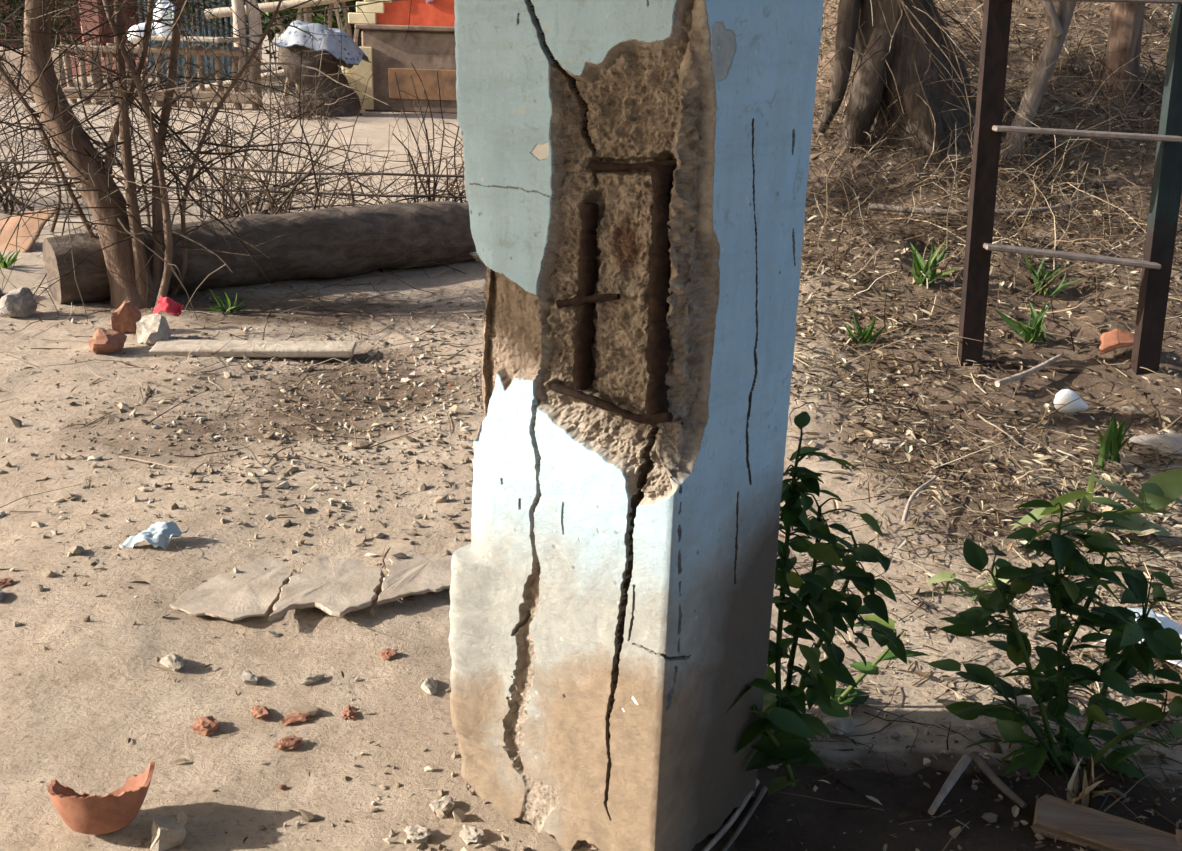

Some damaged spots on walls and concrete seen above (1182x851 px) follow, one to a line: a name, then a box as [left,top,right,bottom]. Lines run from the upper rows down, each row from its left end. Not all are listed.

crack [527,0,602,174]
spalling [466,0,737,506]
crack [734,118,758,584]
crack [504,398,542,775]
crack [606,427,691,801]